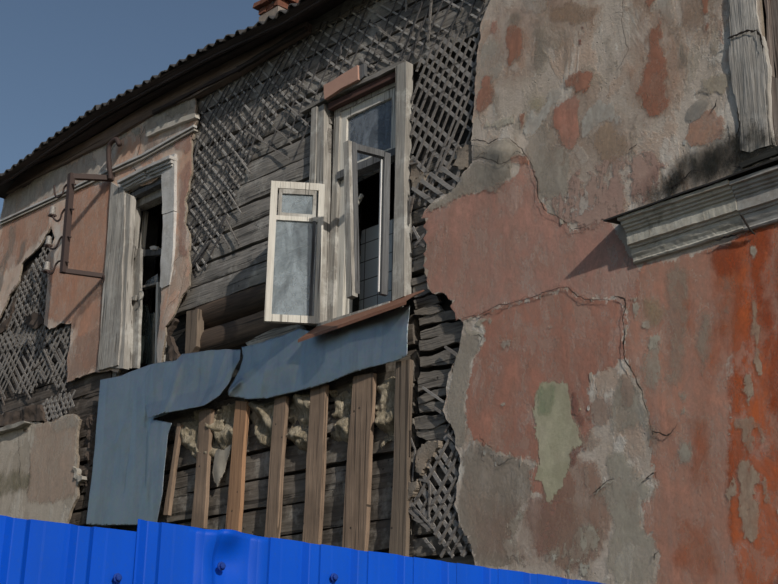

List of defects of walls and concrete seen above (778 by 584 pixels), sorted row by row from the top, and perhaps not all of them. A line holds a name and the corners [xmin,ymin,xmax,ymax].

peeling [143,98,195,131]
crack [471,138,588,230]
peeling [519,71,593,150]
peeling [636,17,671,116]
water stain [653,122,775,199]
peeling [48,183,109,381]
peeling [422,151,665,567]
crack [461,285,677,436]
corrosion [714,224,778,584]
peeling [743,301,763,405]
spalling [73,466,87,483]
peeling [725,460,770,543]